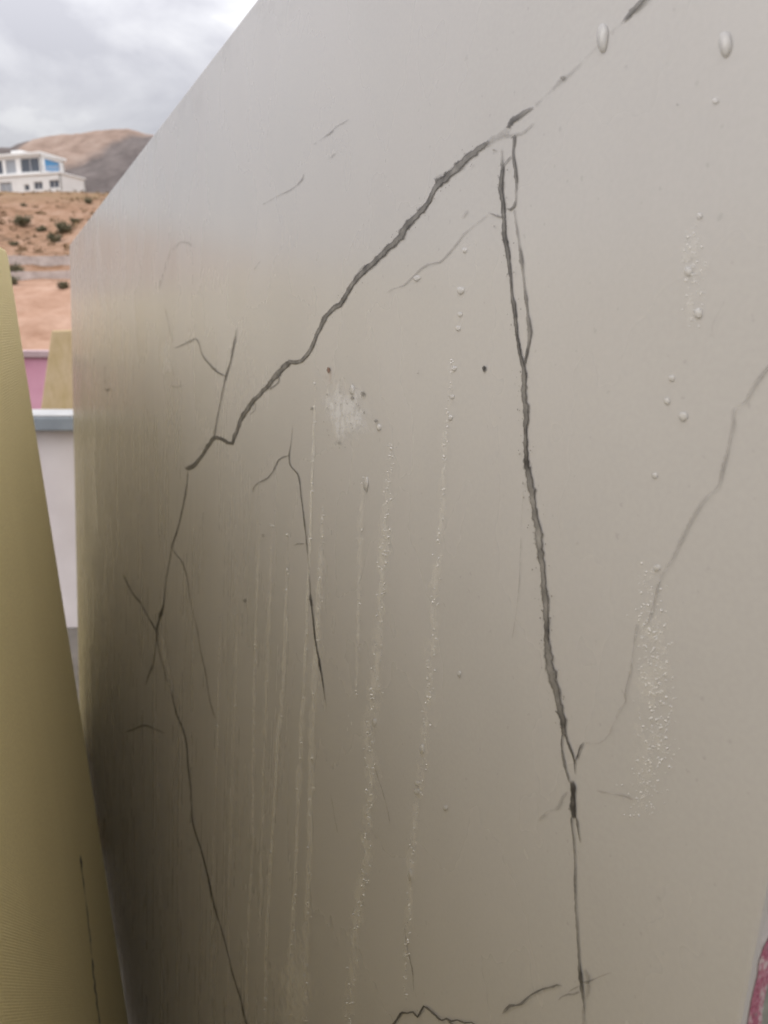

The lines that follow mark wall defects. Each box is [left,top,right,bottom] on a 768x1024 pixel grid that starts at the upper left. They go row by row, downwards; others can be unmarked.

crack [623,0,644,20]
crack [124,108,590,1024]